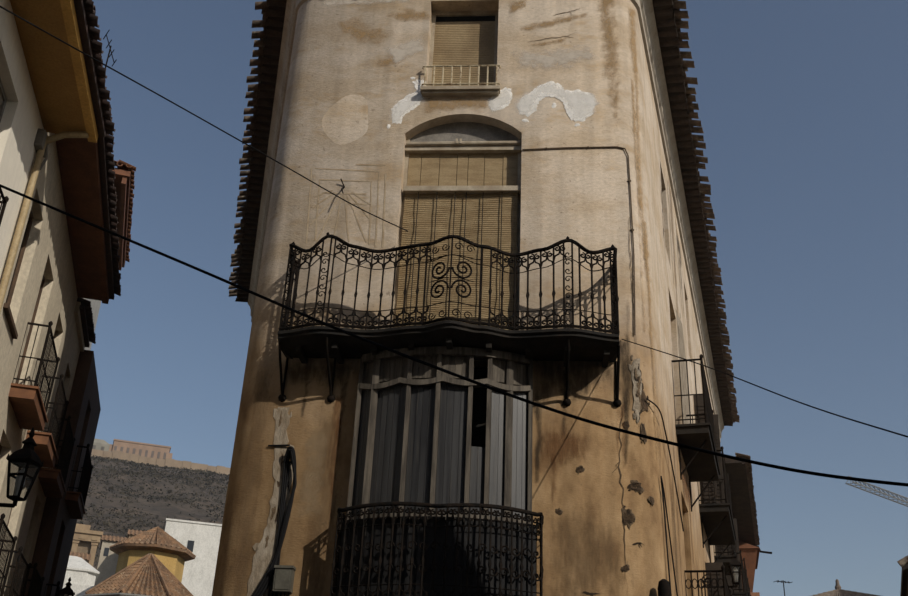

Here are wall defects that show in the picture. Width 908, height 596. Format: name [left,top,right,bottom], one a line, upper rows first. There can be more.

water stain [536,365,599,420]
peeling [622,355,650,443]
peeling [247,407,295,596]
spalling [621,506,636,530]
spalling [627,480,654,506]